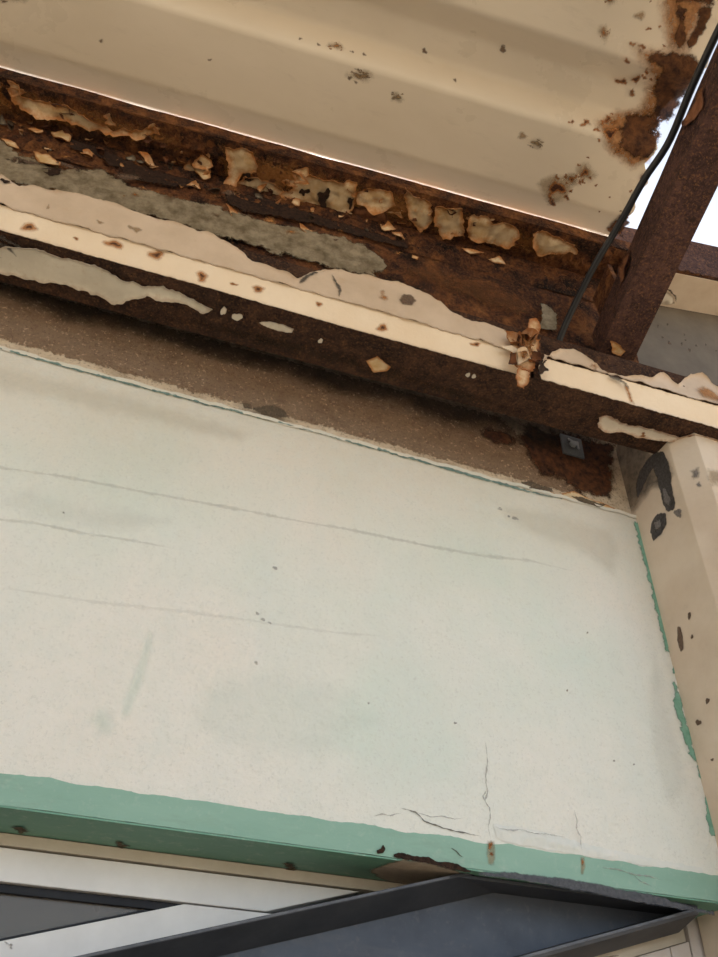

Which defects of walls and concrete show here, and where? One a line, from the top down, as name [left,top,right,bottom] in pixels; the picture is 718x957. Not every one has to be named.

corrosion [568,0,714,165]
corrosion [0,85,631,302]
peeling [0,80,520,378]
peeling [532,230,578,257]
corrosion [0,224,718,498]
peeling [540,303,557,330]
peeling [610,341,626,356]
spalling [243,403,288,418]
spalling [522,481,615,509]
peeling [538,349,718,541]
leakage [616,444,658,509]
crack [406,809,469,857]